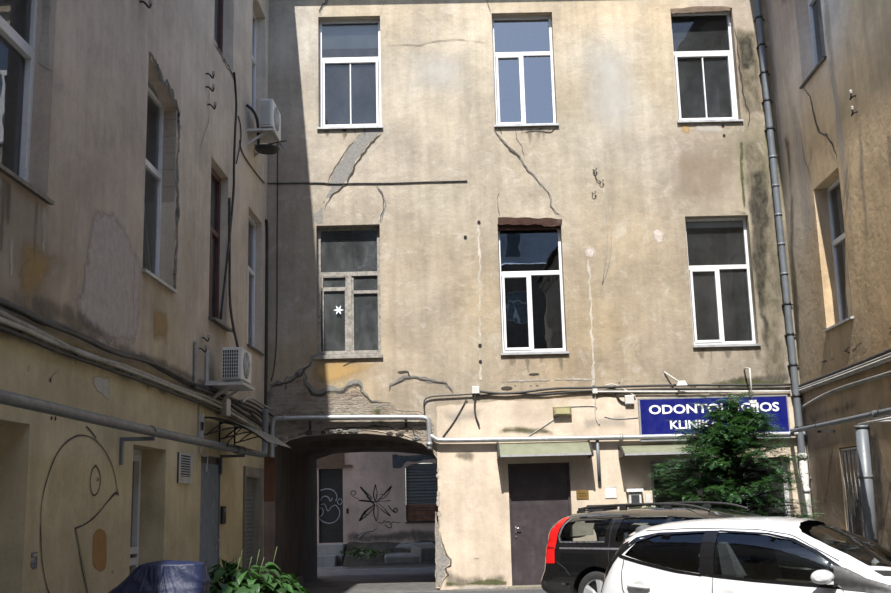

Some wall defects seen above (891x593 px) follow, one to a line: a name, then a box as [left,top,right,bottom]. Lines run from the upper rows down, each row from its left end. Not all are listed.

damp [737,32,760,110]
crack [377,186,386,221]
crack [493,127,561,216]
crack [798,90,838,180]
spalling [77,212,141,345]
damp [720,144,787,390]
spalling [267,362,437,455]
crack [299,425,422,441]
crack [269,354,453,403]
spalling [435,468,452,588]